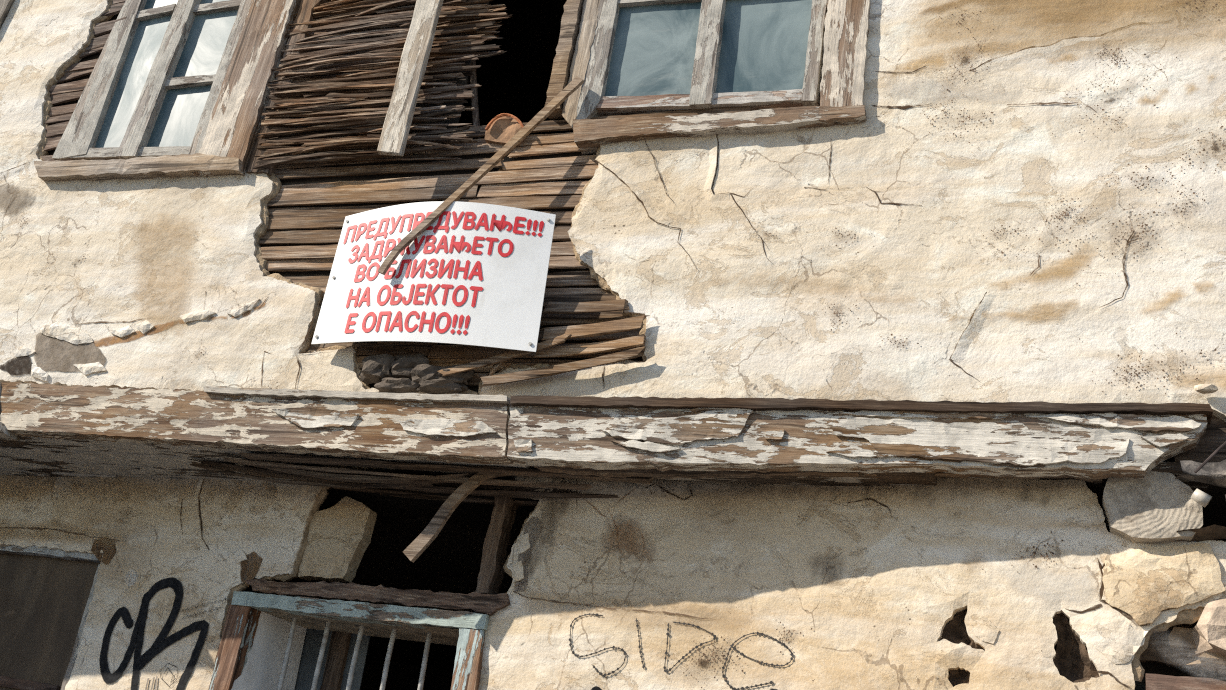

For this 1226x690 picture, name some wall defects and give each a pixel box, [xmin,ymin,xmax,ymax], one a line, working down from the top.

crack [872,102,932,110]
leakage [904,0,1226,143]
crack [703,134,772,263]
crack [804,148,922,206]
crack [1101,231,1142,307]
spalling [0,299,265,382]
crack [949,292,996,382]
peeling [398,418,497,437]
peeling [603,408,753,453]
peeling [826,410,1201,466]
spalling [939,609,982,649]
flaking render [1053,543,1225,683]